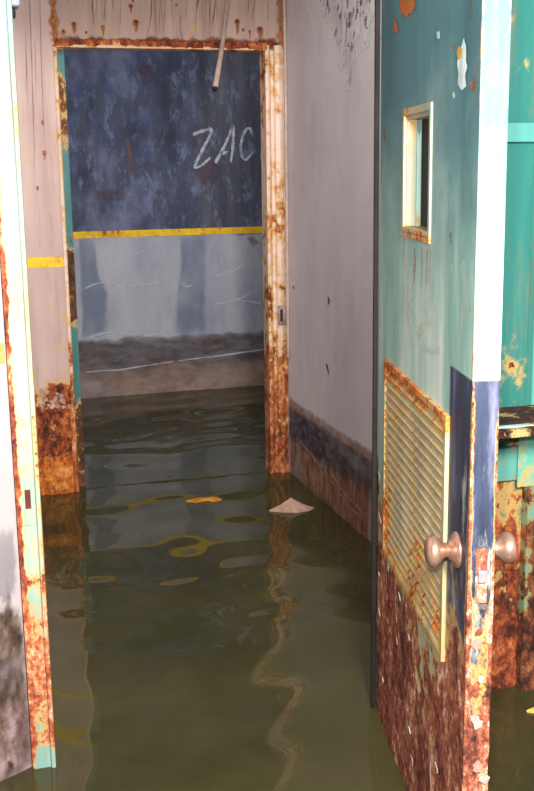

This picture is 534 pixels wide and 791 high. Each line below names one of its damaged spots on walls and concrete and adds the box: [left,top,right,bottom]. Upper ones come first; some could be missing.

rust [49,0,283,50]
rust [394,0,415,33]
peeling [452,39,467,98]
leakage [289,398,378,546]
leakage [0,605,31,780]